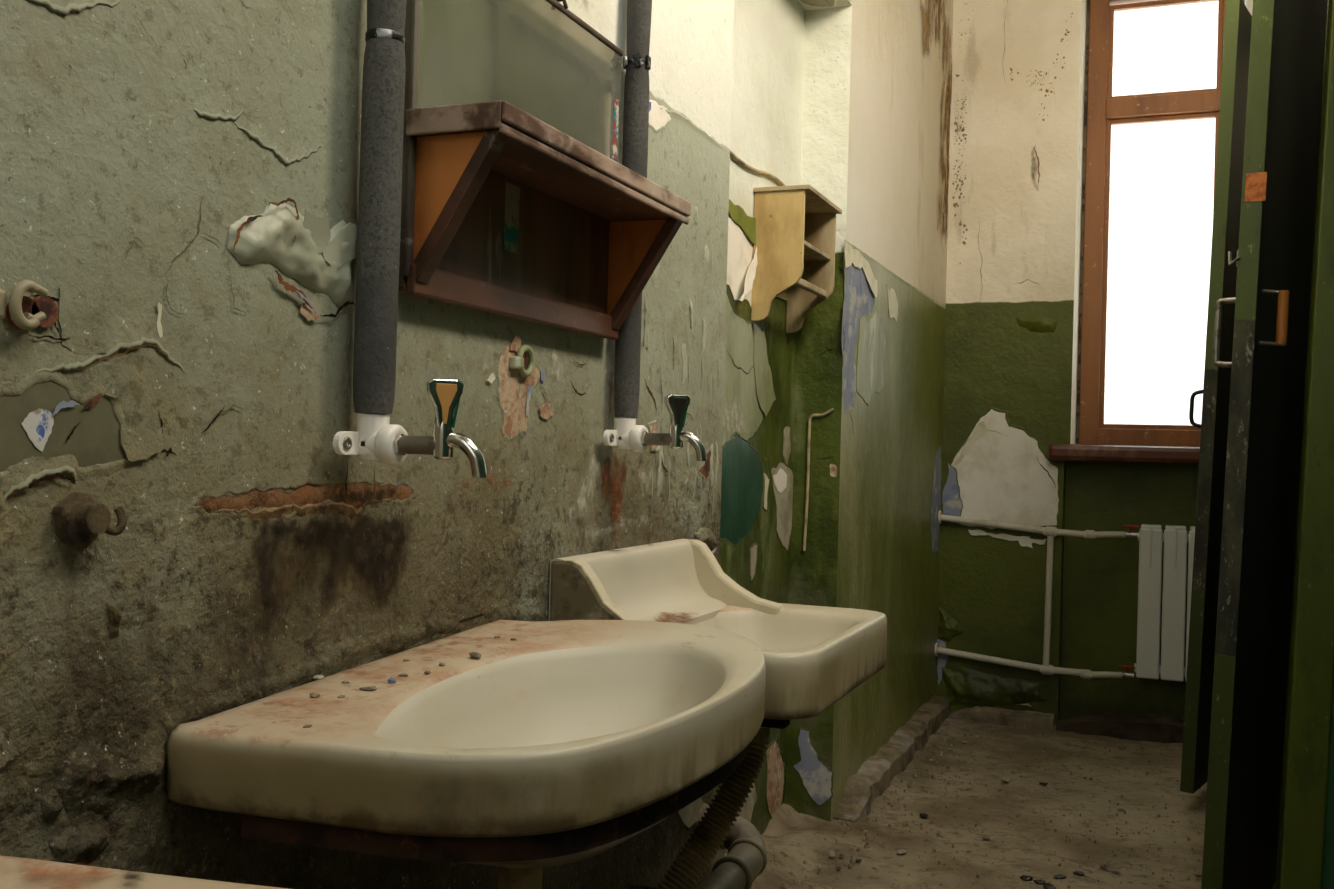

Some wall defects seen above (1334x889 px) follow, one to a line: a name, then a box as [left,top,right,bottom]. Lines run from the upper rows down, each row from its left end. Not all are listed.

damp [922,0,971,245]
peeling [0,285,188,501]
peeling [487,331,554,442]
peeling [697,199,793,582]
peeling [841,239,946,435]
corrosion [190,462,416,521]
peeling [930,405,1063,556]
damp [255,509,409,629]
peeling [739,728,834,823]